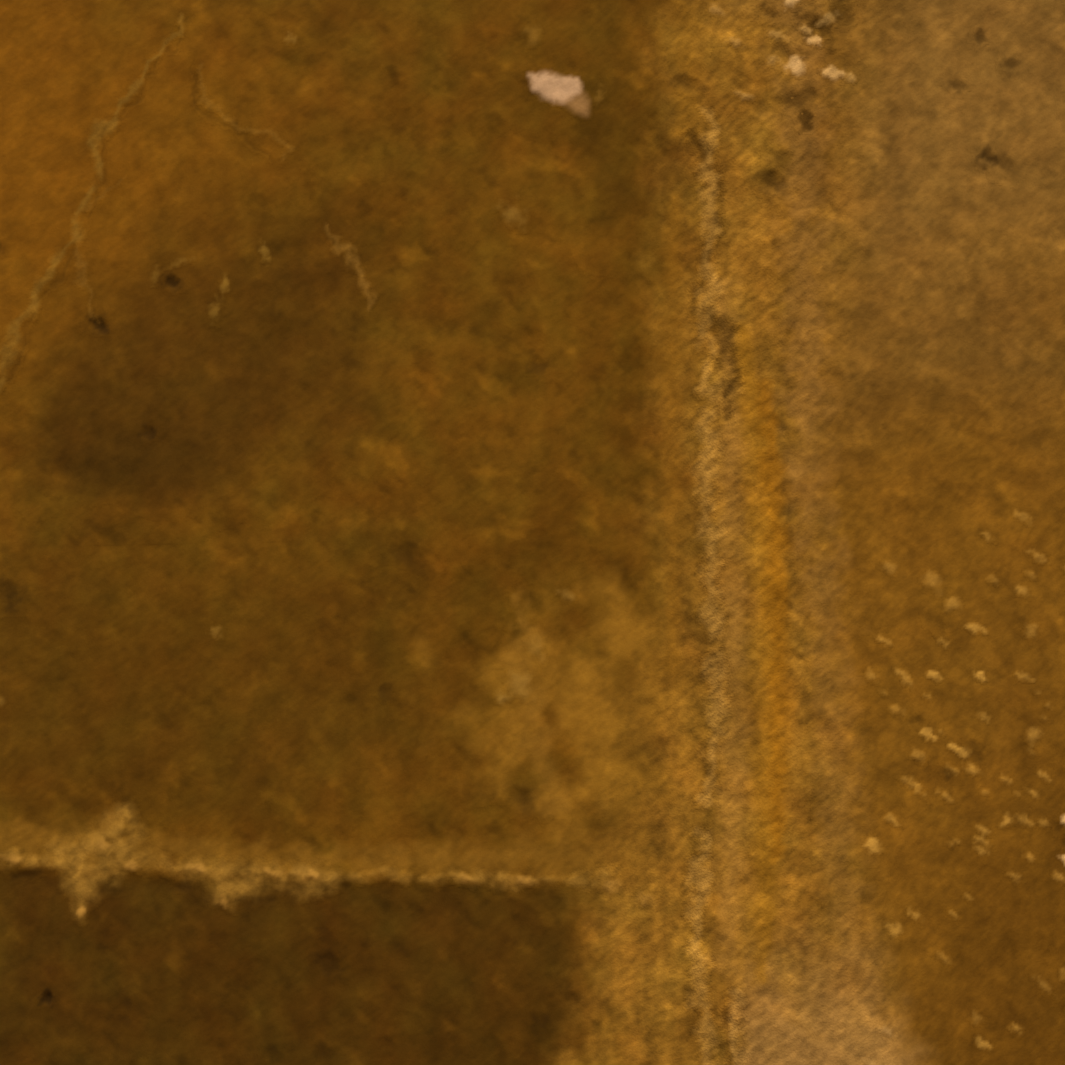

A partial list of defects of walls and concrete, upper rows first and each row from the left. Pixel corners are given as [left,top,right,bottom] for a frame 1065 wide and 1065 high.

spalling [525,67,609,121]
water stain [0,174,513,842]